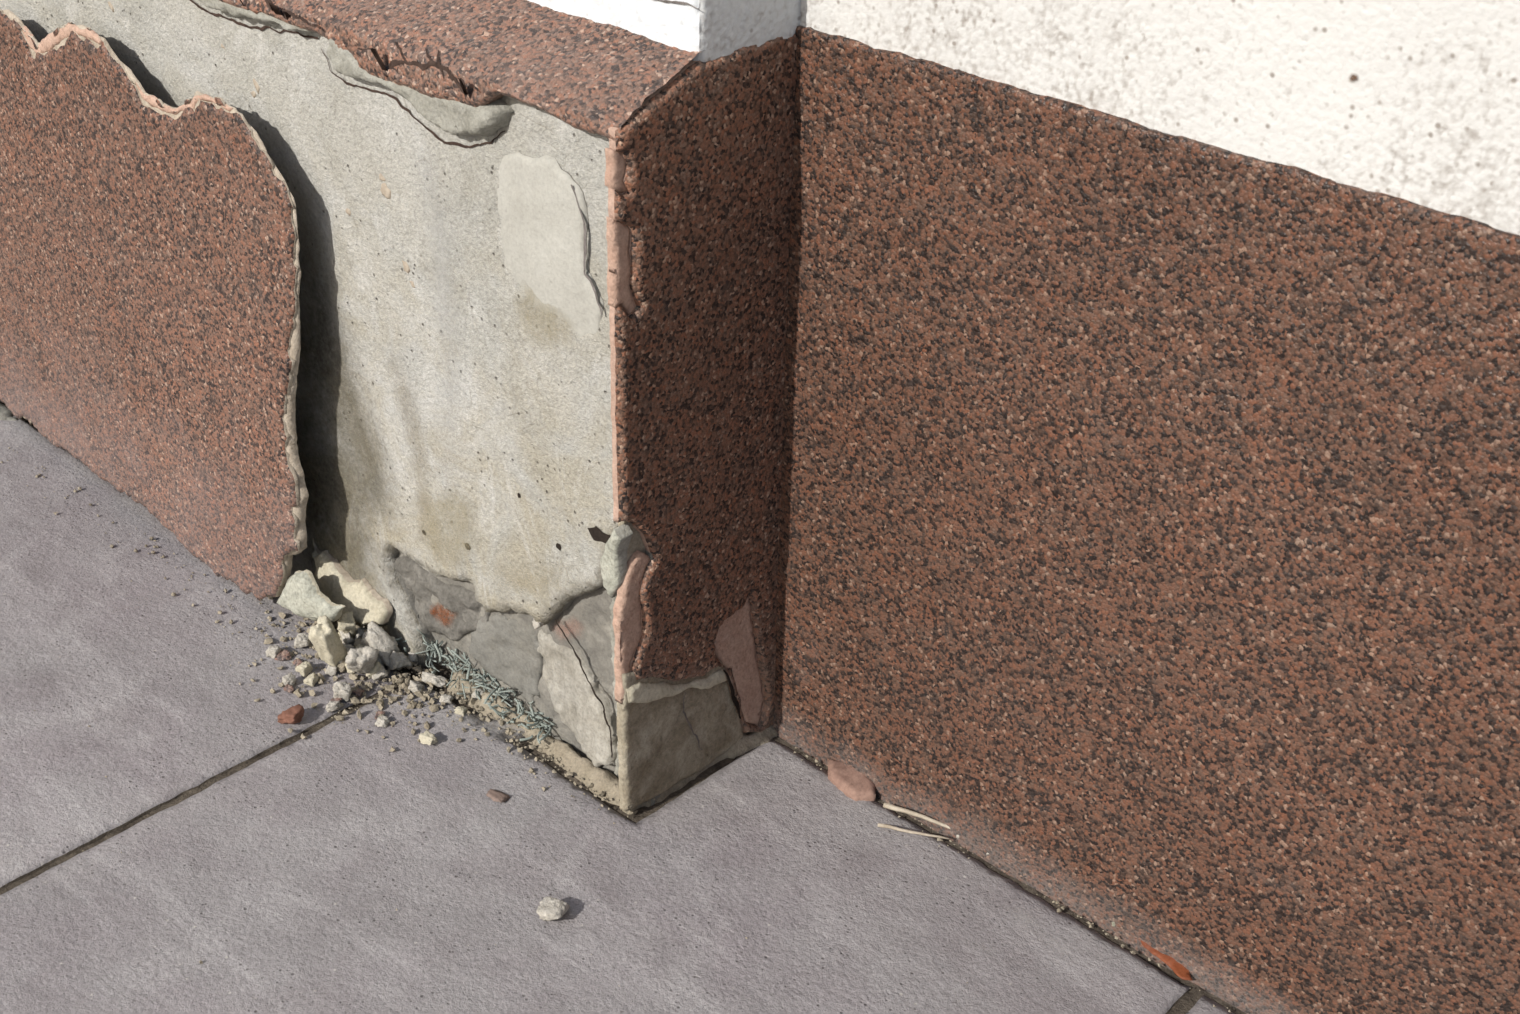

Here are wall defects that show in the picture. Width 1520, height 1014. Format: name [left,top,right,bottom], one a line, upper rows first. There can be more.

crack [189,0,505,148]
peeling [0,0,764,812]